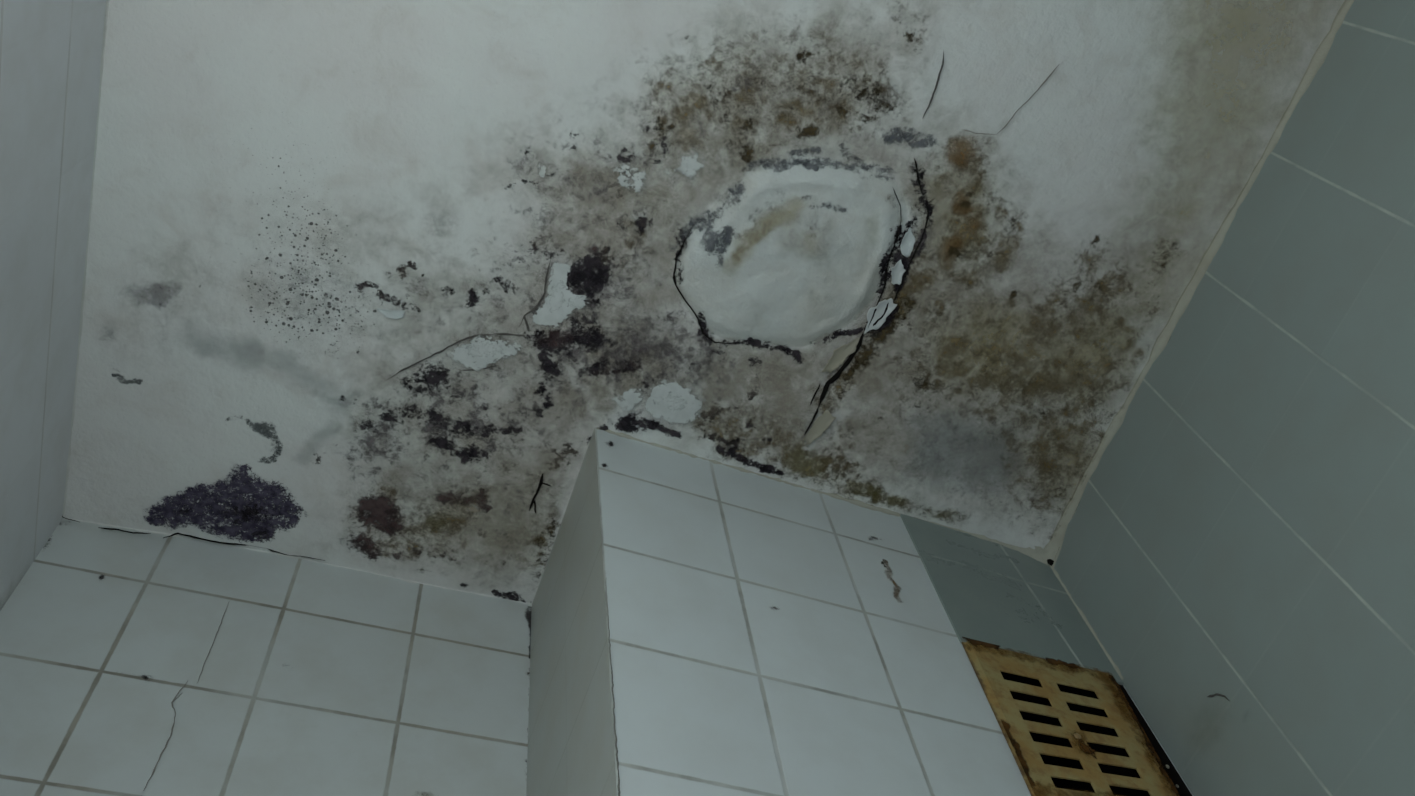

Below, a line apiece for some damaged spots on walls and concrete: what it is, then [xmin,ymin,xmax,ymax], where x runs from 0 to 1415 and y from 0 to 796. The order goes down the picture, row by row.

crack [922,51,944,119]
water stain [112,374,141,385]
water stain [242,187,421,358]
crack [387,259,551,380]
peeling [532,262,589,328]
peeling [611,379,705,424]
water stain [348,36,1142,576]
crack [804,158,929,435]
water stain [143,419,306,543]
water stain [491,589,532,675]
crack [141,602,229,796]
corrosion [962,637,1180,796]